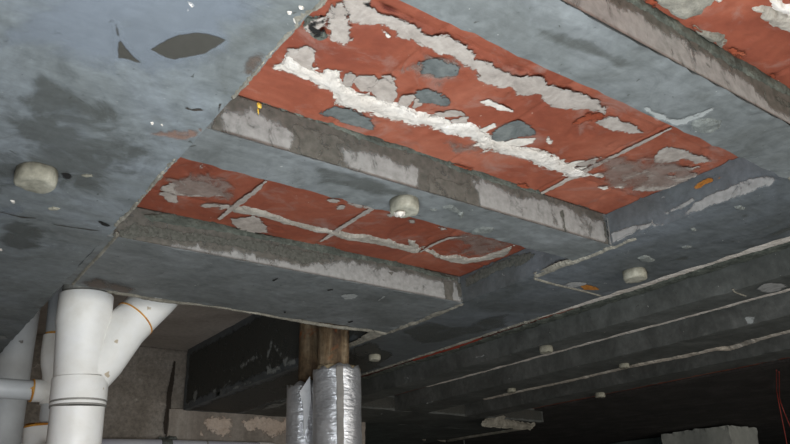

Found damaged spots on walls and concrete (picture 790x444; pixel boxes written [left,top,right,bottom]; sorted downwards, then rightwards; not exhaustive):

spalling [287,6,329,41]
peeling [752,0,790,32]
leakage [151,33,225,59]
spalling [572,112,605,125]
peeling [200,416,233,437]
peeling [242,416,286,438]
spalling [481,415,535,430]